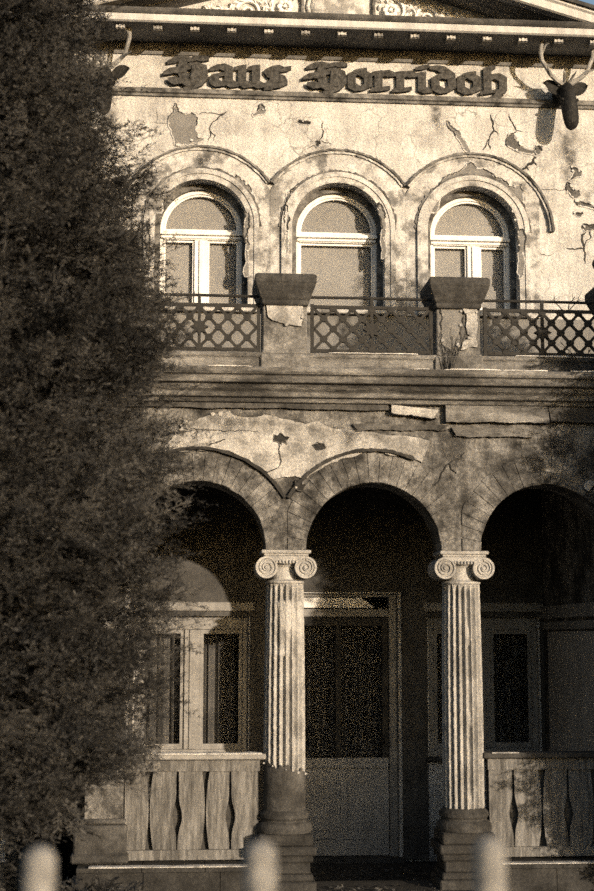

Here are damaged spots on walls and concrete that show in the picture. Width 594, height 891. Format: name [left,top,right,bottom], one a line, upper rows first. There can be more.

spalling [167,103,206,147]
crack [199,111,227,141]
spalling [438,120,525,203]
crack [483,114,522,150]
spalling [505,133,544,157]
spalling [565,166,594,233]
peeling [512,210,527,279]
spalling [440,309,478,352]
crack [179,428,260,446]
peeling [165,411,430,492]